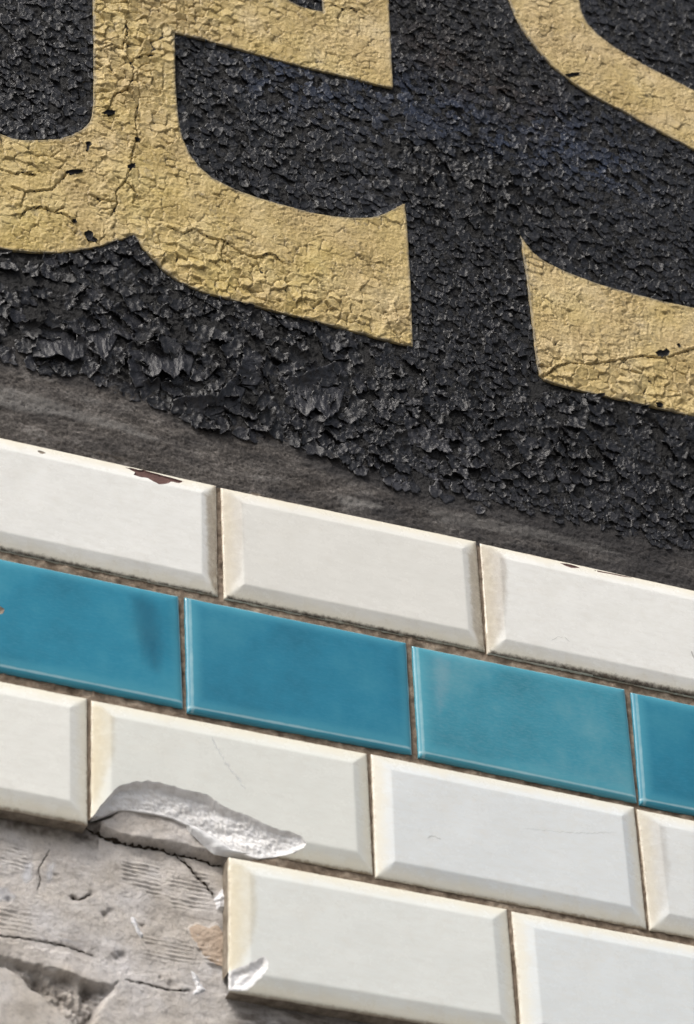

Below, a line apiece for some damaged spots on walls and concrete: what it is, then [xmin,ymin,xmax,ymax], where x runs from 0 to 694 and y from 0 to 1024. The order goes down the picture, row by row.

crack [97,24,149,213]
peeling [0,0,694,550]
spalling [90,780,306,861]
crack [86,828,221,896]
spalling [228,956,269,991]